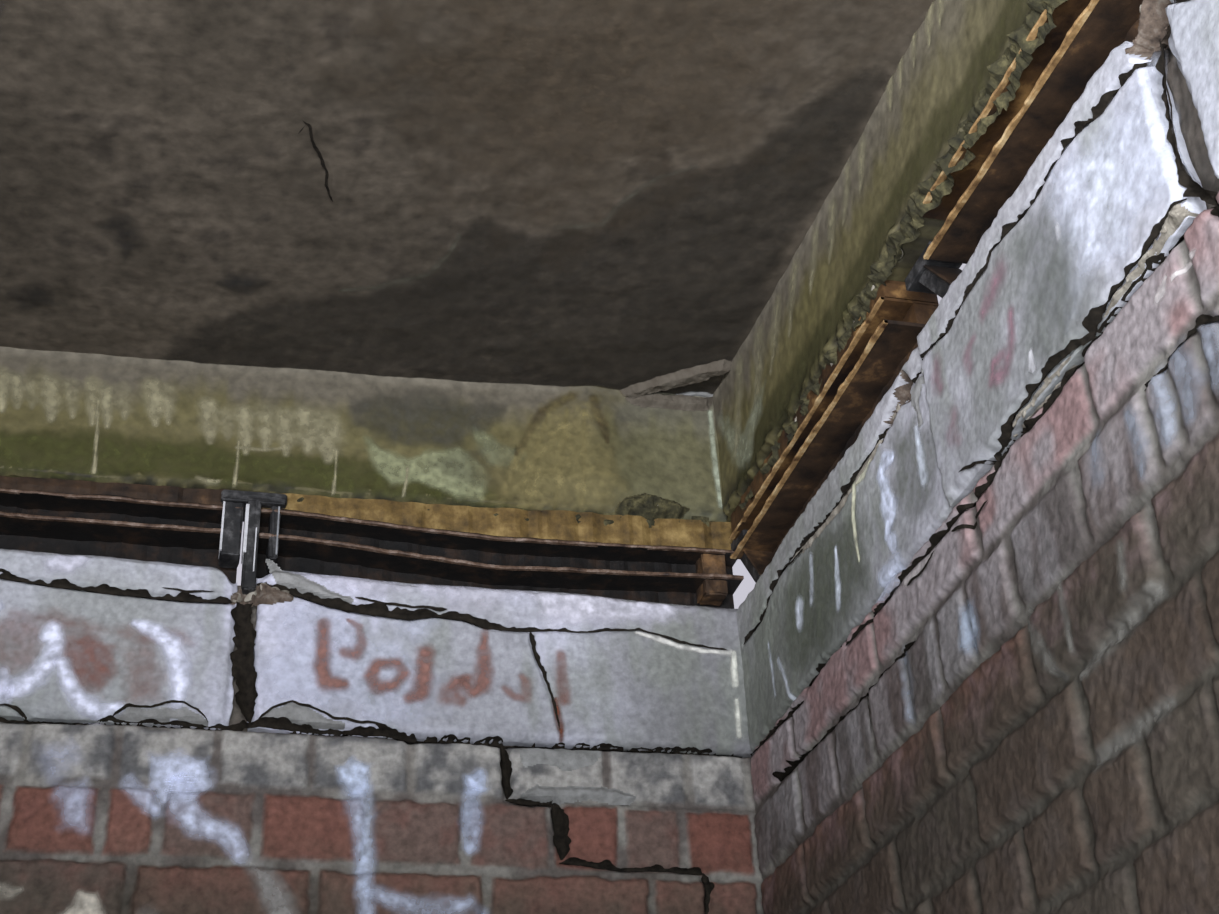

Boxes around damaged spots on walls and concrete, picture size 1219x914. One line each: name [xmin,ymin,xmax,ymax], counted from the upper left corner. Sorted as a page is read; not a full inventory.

crack [298,120,333,201]
water stain [708,0,1029,507]
water stain [1060,117,1162,259]
water stain [201,401,338,494]
water stain [371,431,526,499]
crack [841,40,1219,647]
water stain [1152,349,1193,443]
water stain [48,555,87,571]
water stain [241,504,257,572]
crack [743,427,890,645]
crack [0,568,830,914]
crack [772,641,915,782]